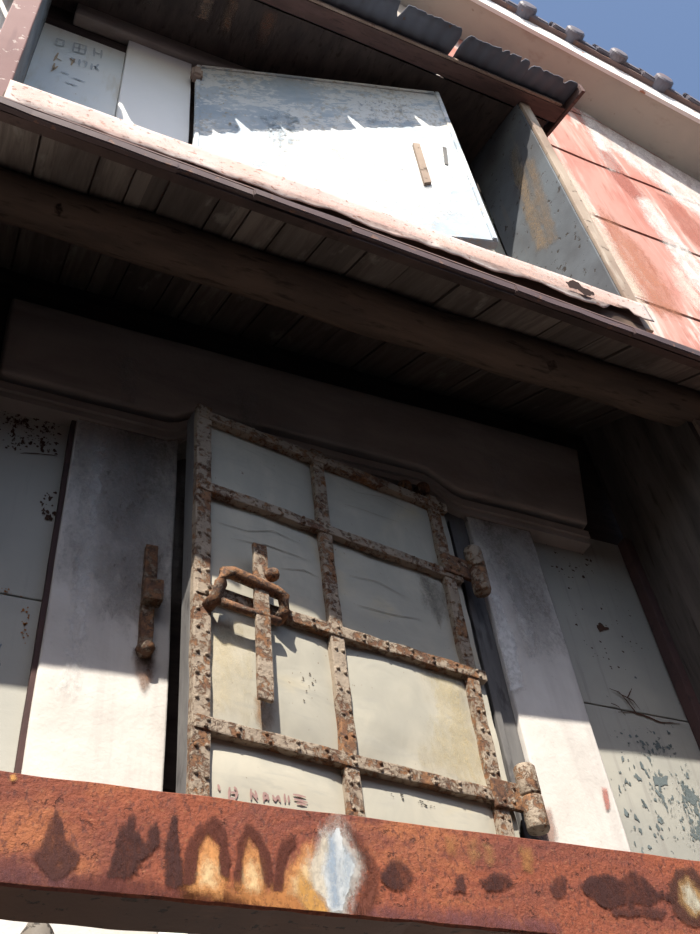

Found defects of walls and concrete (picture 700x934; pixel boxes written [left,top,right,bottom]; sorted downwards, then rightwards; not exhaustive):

corrosion [601,150,642,197]
corrosion [563,165,679,316]
peeling [0,411,61,456]
crack [611,688,680,724]
peeling [614,730,700,853]
corrosion [538,810,555,842]
corrosion [1,816,316,911]
corrosion [380,859,411,889]
corrosion [453,874,466,892]
corrosion [480,873,513,890]
corrosion [580,867,700,926]
corrosion [435,911,559,933]